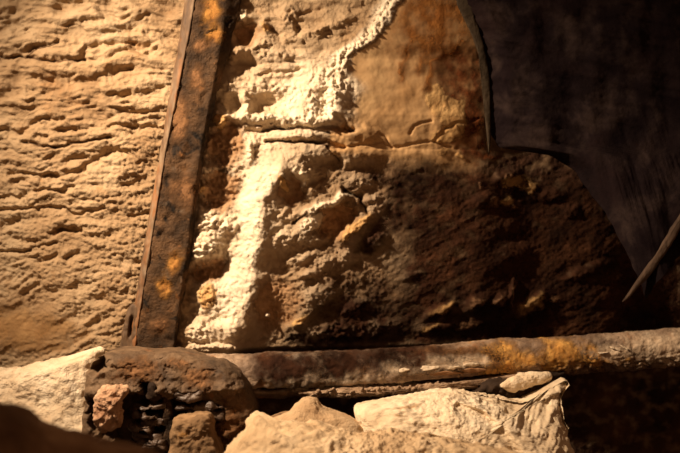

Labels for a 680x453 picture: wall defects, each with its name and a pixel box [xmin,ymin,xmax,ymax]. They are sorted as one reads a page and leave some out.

rust [204,0,220,20]
rust [194,28,222,51]
rust [191,69,203,88]
rust [172,100,188,138]
crack [262,128,340,161]
rust [171,166,200,206]
damp [360,174,424,255]
rust [168,255,181,271]
rust [156,277,171,296]
rust [423,337,610,375]